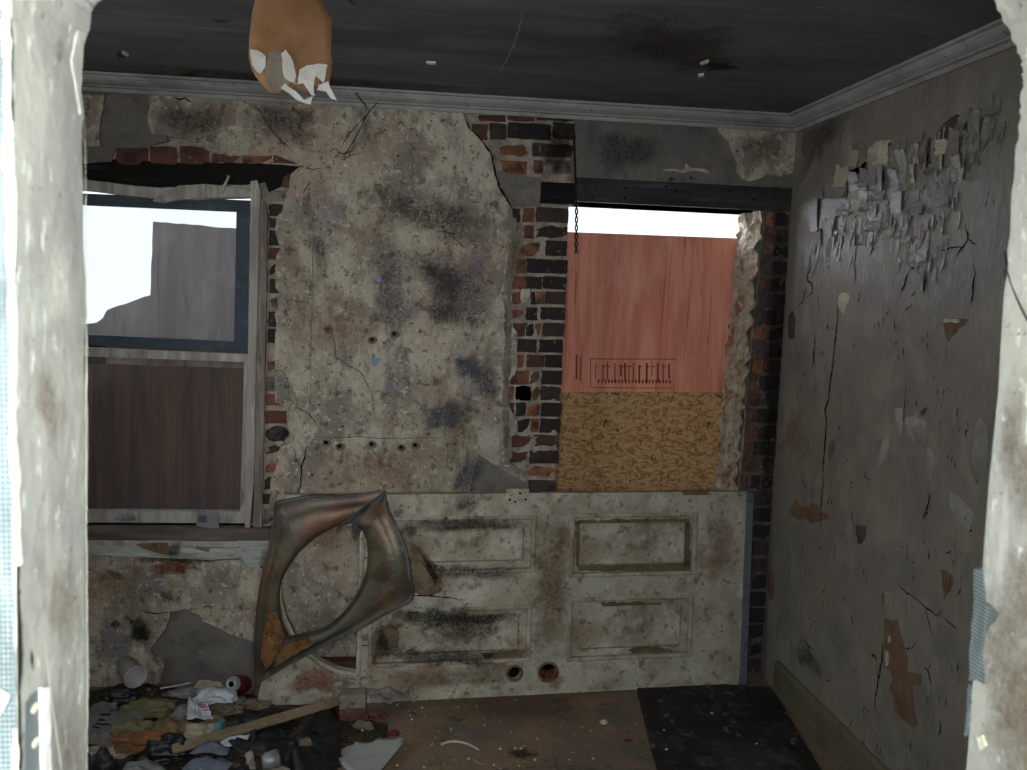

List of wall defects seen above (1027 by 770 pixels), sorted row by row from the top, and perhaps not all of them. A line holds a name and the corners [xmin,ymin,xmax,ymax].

crack [819,181,878,286]
flaking render [81,91,300,526]
flaking render [463,113,969,492]
flaking render [739,210,796,675]
crack [812,307,838,525]
peeling [237,540,269,568]
peeling [575,518,691,572]
flaking render [151,609,261,685]
peeling [481,649,525,658]
peeling [628,646,673,654]
peeling [884,619,922,729]